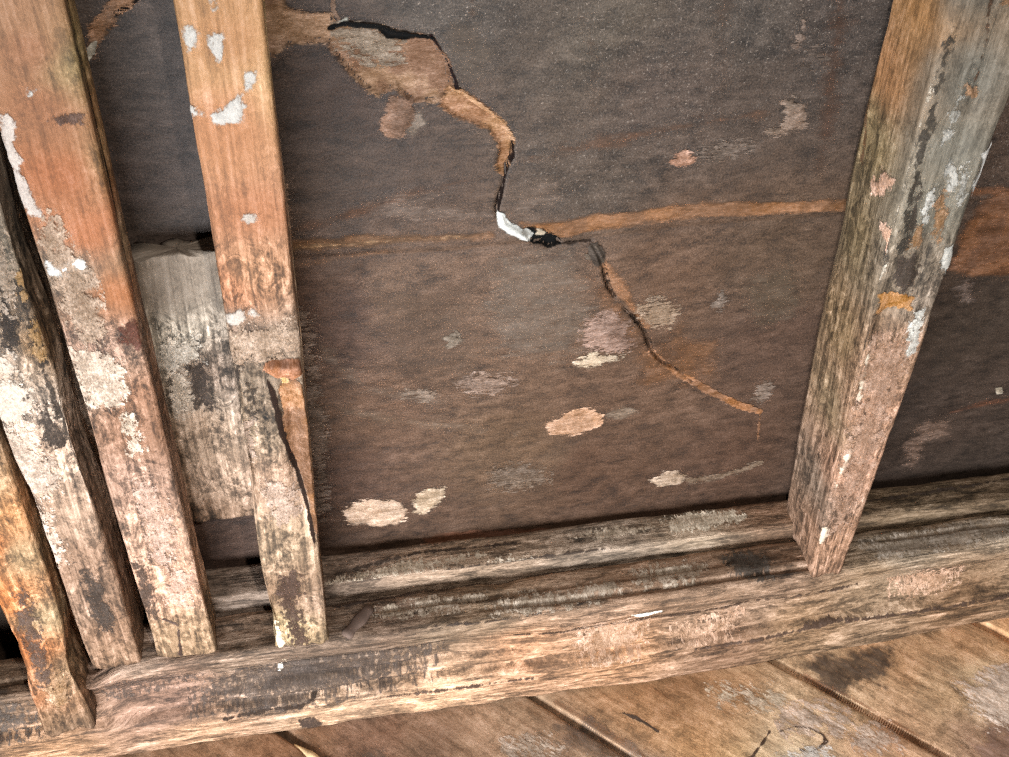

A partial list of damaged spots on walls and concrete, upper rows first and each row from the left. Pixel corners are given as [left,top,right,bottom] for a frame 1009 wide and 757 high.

spalling [265,0,515,176]
crack [327,0,459,90]
crack [494,140,515,219]
peeling [298,306,446,527]
peeling [545,407,637,436]
crack [558,238,762,440]